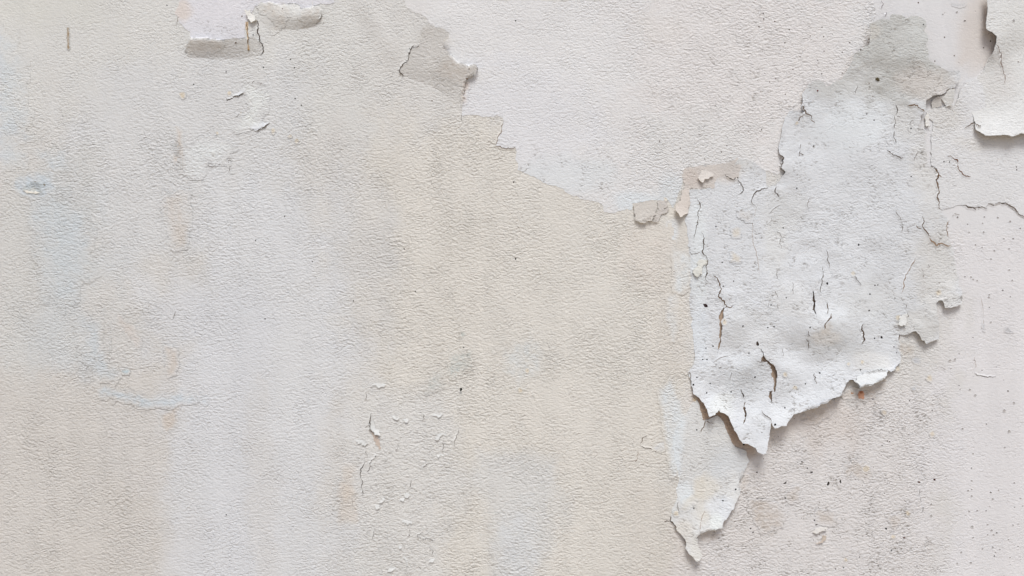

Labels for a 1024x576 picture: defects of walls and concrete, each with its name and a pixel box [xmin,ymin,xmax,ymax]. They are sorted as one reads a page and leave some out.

peeling [175,0,335,59]
crack [692,200,732,308]
peeling [400,0,1024,562]
crack [723,106,832,384]
crack [887,104,1024,342]
crack [358,391,399,497]